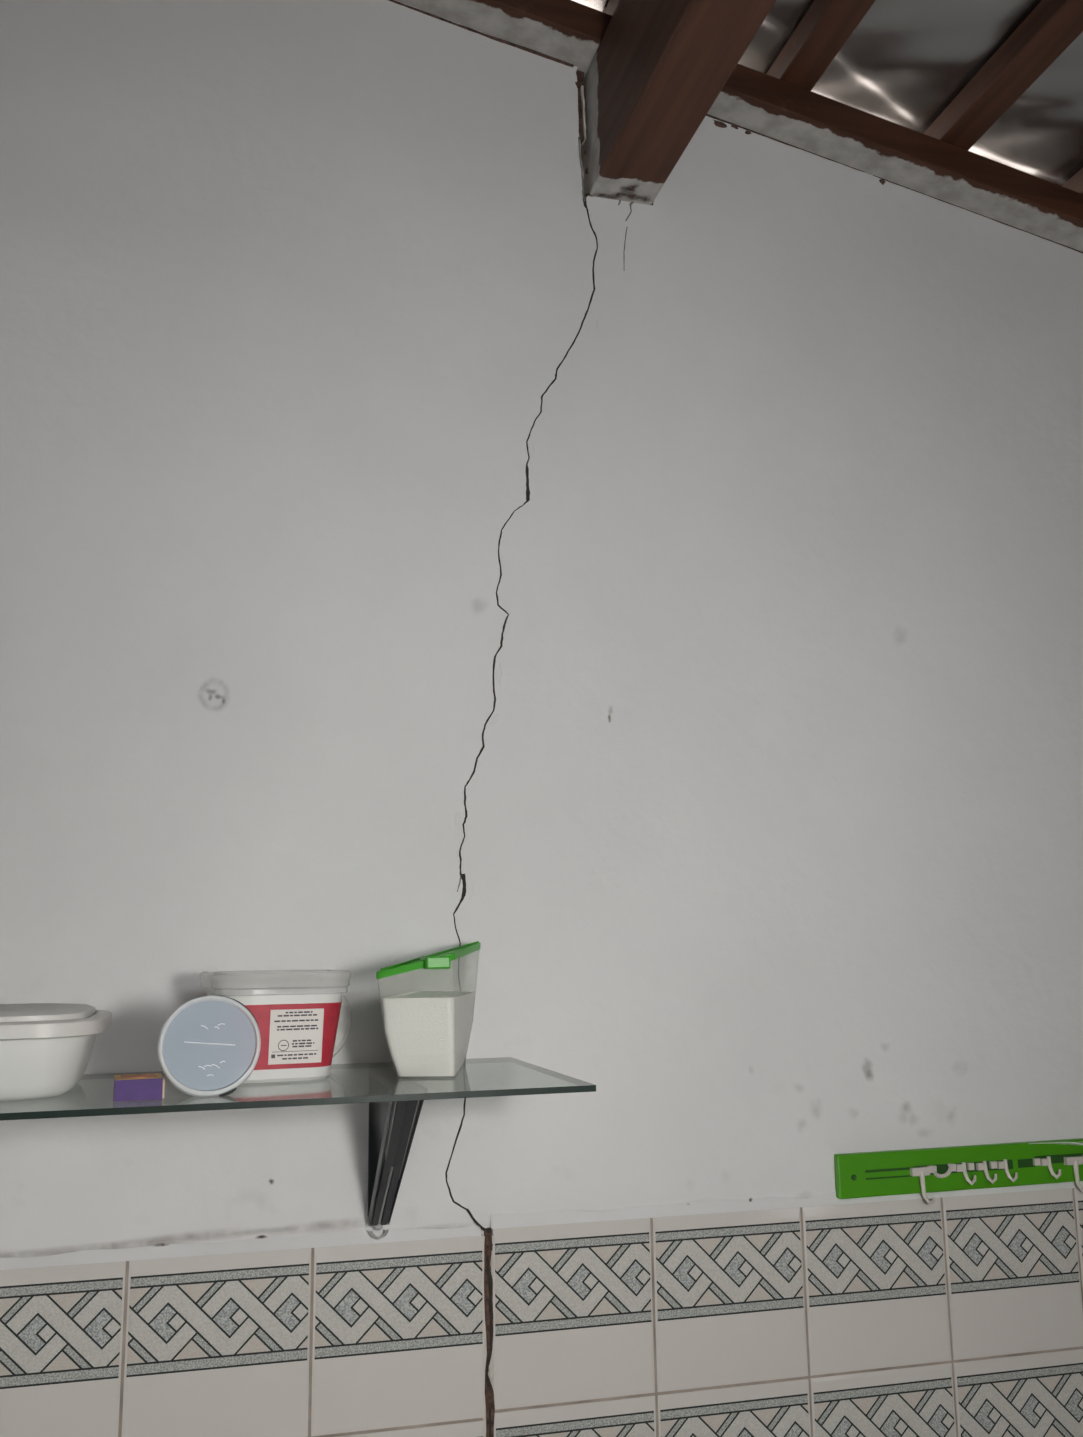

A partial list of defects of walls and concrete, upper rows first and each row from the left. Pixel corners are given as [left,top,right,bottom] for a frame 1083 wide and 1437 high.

crack [453,199,634,991]
crack [445,1098,495,1437]